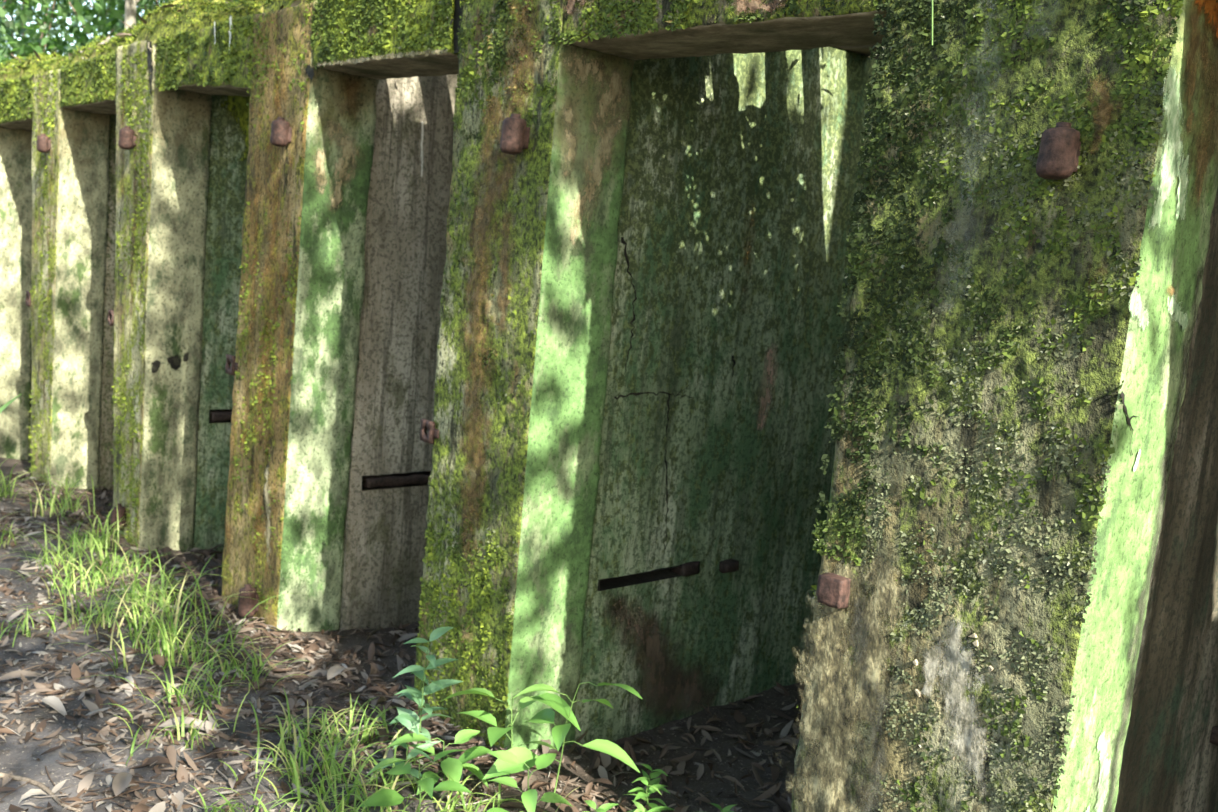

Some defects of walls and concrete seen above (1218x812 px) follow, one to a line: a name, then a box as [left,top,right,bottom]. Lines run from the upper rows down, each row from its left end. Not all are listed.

rust [1195,0,1218,39]
crack [614,237,698,549]